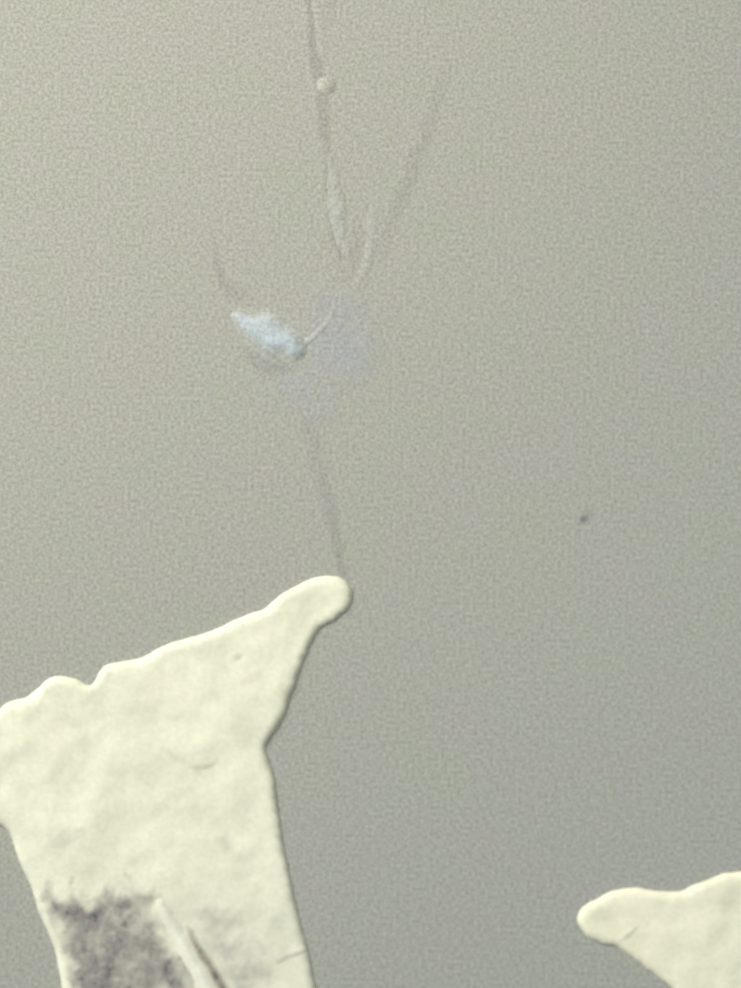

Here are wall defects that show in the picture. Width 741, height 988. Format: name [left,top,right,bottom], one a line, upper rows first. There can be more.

crack [297,420,351,583]